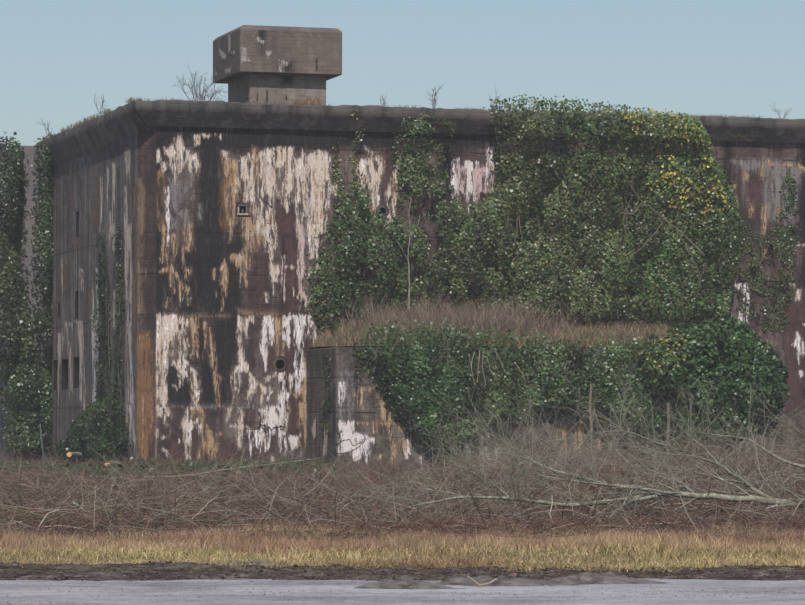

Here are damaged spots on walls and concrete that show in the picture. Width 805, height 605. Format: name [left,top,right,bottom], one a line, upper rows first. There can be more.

peeling [156,133,222,184]
peeling [156,314,222,461]
corrosion [131,167,312,464]
peeling [230,312,319,459]
peeling [222,146,338,303]
damp [156,126,495,435]
peeling [338,420,375,464]
peeling [338,381,394,441]
peeling [355,146,401,247]
peeling [451,146,494,213]
damp [723,141,805,302]
damp [791,323,805,394]